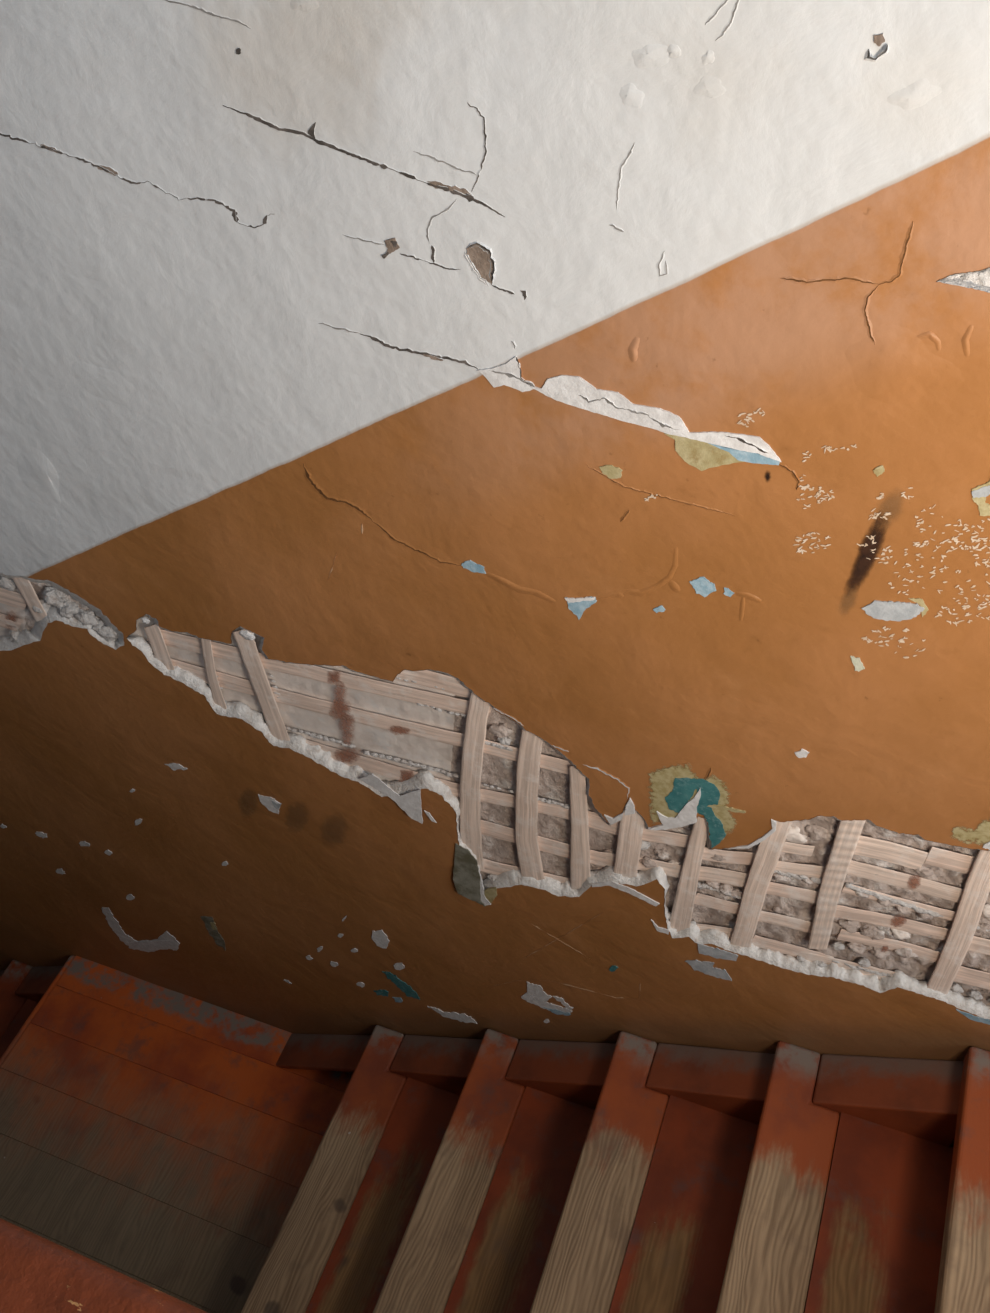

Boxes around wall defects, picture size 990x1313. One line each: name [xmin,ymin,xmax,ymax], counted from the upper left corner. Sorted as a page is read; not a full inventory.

crack [163,0,251,29]
crack [0,132,270,229]
crack [223,102,505,270]
crack [492,285,527,300]
crack [780,221,914,345]
spalling [937,268,990,293]
spalling [477,356,801,490]
spalling [972,481,990,516]
spalling [462,560,486,574]
water stain [848,519,884,589]
spalling [0,573,990,1025]